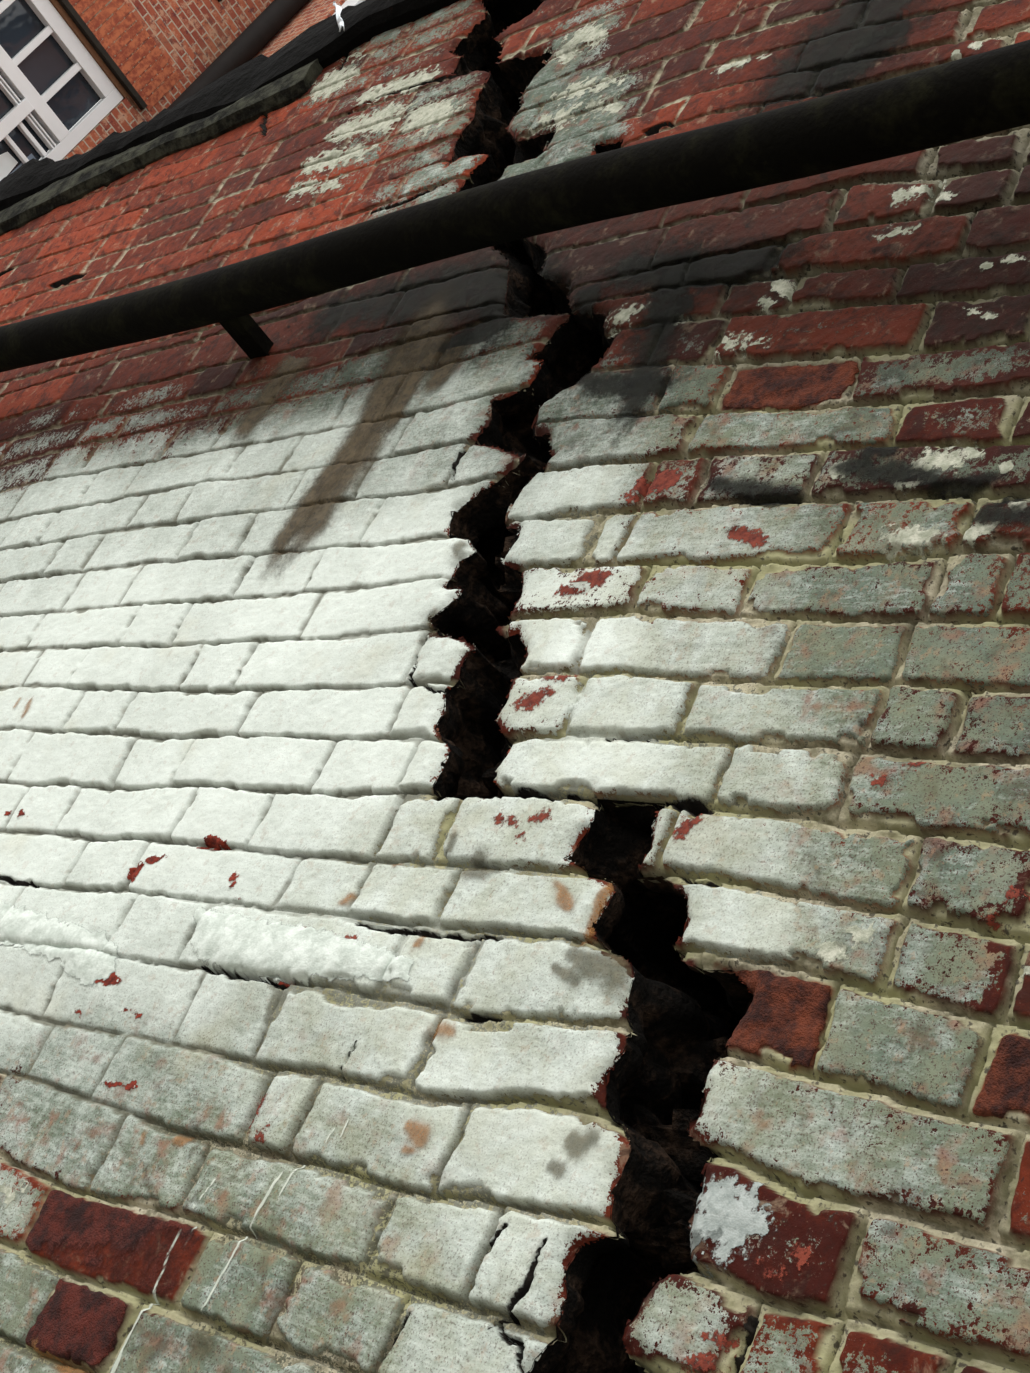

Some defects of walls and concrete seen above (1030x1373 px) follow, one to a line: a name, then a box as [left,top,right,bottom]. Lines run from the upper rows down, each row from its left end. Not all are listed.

leakage [756,0,917,113]
crack [347,0,556,214]
crack [645,122,674,136]
spalling [723,360,859,411]
peeling [716,520,770,550]
crack [409,238,754,1373]
peeling [672,814,704,840]
crack [355,923,500,942]
spalling [726,970,831,1068]
spalling [972,1035,1030,1119]
spalling [25,1190,199,1366]
crack [735,1315,759,1373]